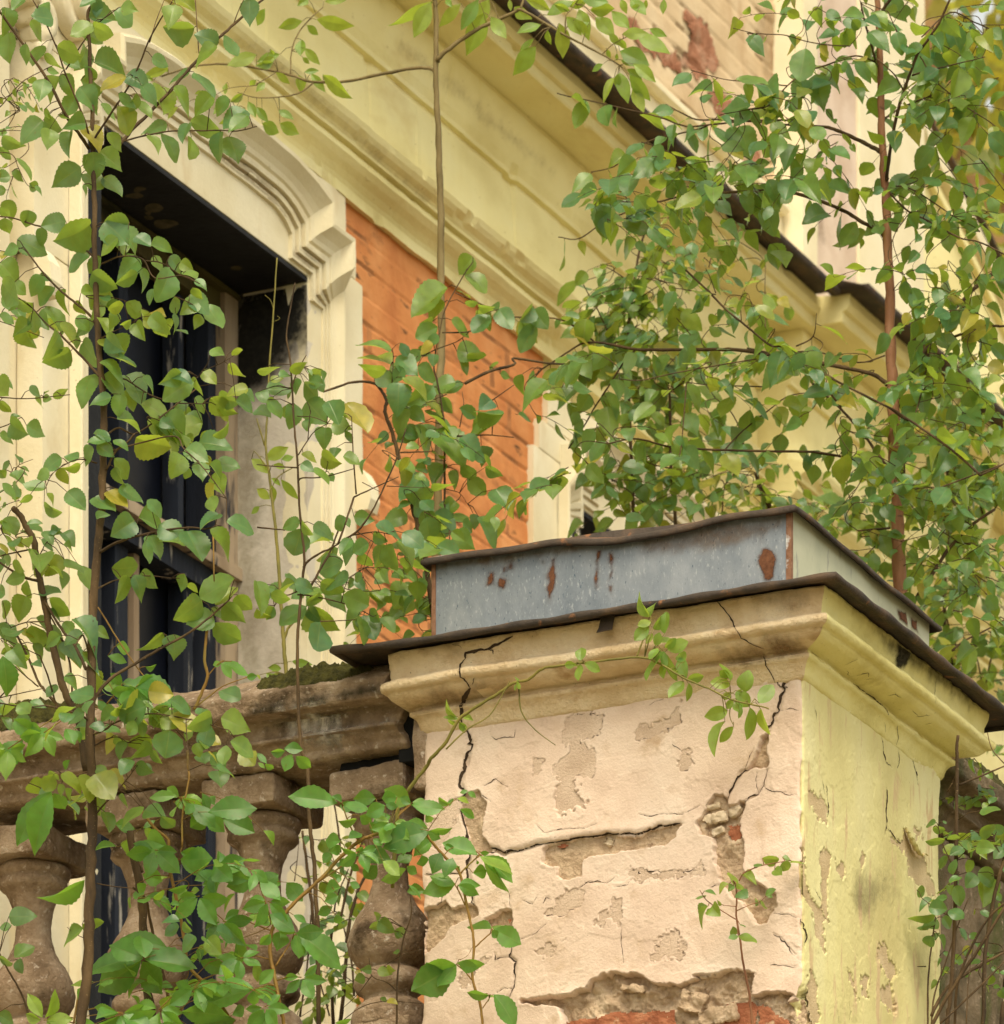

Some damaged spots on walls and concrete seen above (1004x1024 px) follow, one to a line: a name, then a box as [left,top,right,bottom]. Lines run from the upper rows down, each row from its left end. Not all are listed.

flaking render [628,8,732,117]
rust [482,557,512,588]
rust [547,559,556,597]
rust [758,549,776,579]
crack [718,603,817,728]
crack [426,636,700,905]
peeling [532,711,604,814]
crack [728,752,798,802]
flaking render [544,825,682,917]
flaking render [699,796,778,924]
peeling [889,826,940,898]
flaking render [529,970,820,1024]